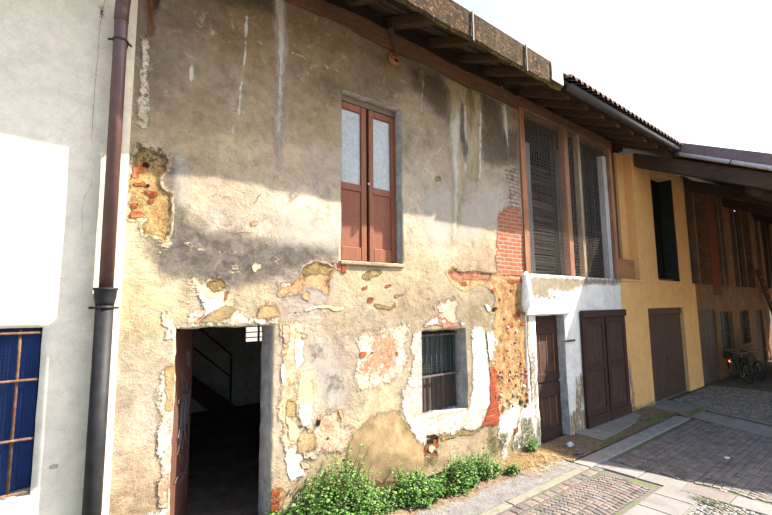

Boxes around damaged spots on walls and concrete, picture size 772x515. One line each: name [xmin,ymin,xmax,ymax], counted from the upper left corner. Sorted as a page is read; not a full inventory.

flaking render [136,36,152,128]
spalling [126,141,175,254]
leakage [241,0,287,158]
leakage [414,70,517,241]
flaking render [495,169,525,279]
flaking render [142,362,175,515]
flaking render [161,259,356,481]
flaking render [270,486,286,514]
flaking render [353,296,498,459]